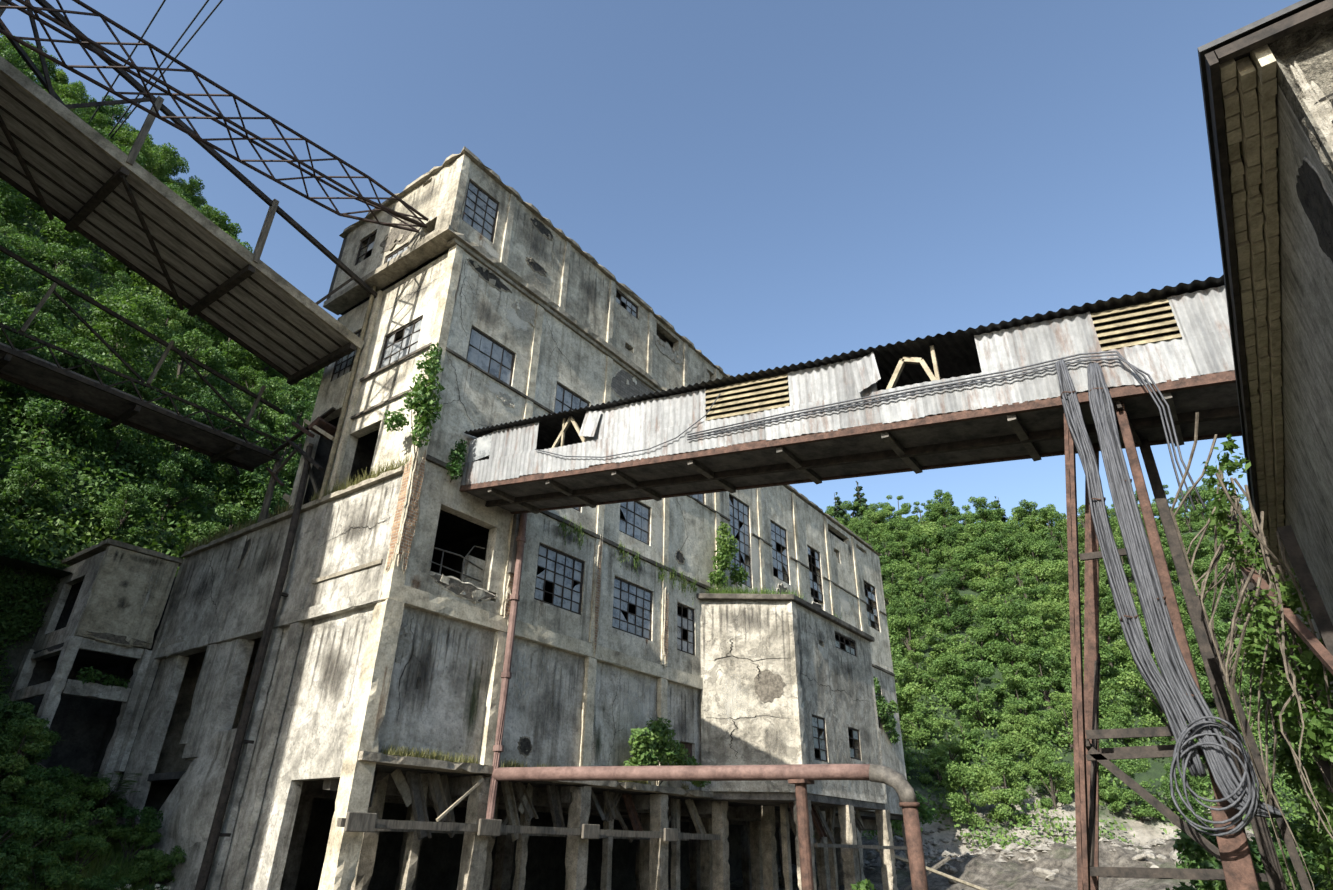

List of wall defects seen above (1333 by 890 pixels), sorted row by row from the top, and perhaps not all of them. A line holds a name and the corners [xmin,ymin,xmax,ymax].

crack [1315,93,1333,123]
damp [308,628,362,692]
crack [712,639,775,680]
spalling [754,669,786,702]
crack [706,715,791,757]
rust [493,764,929,890]